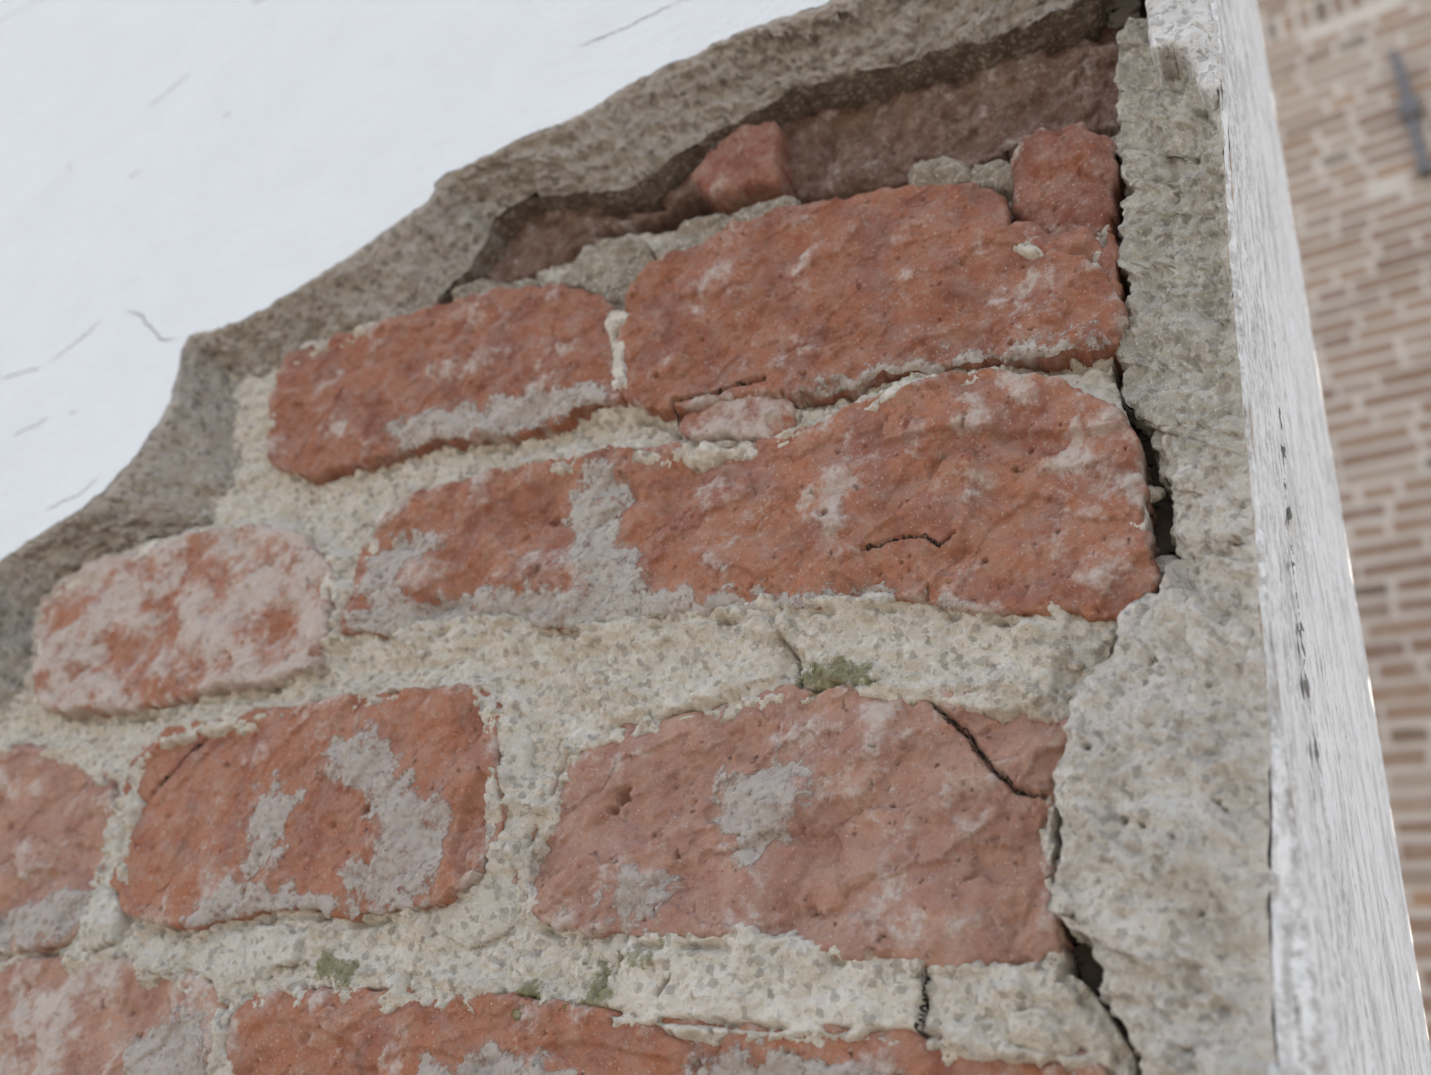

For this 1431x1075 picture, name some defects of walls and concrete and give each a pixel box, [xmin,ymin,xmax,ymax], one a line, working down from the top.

crack [1108,0,1141,28]
crack [1123,286,1131,299]
crack [1118,377,1181,559]
flaking render [505,726,538,797]
crack [931,702,1043,799]
flaking render [530,674,1075,968]
flaking render [0,923,312,1075]
flaking render [225,986,1111,1075]
crack [914,971,930,1035]
crack [1070,934,1142,1060]